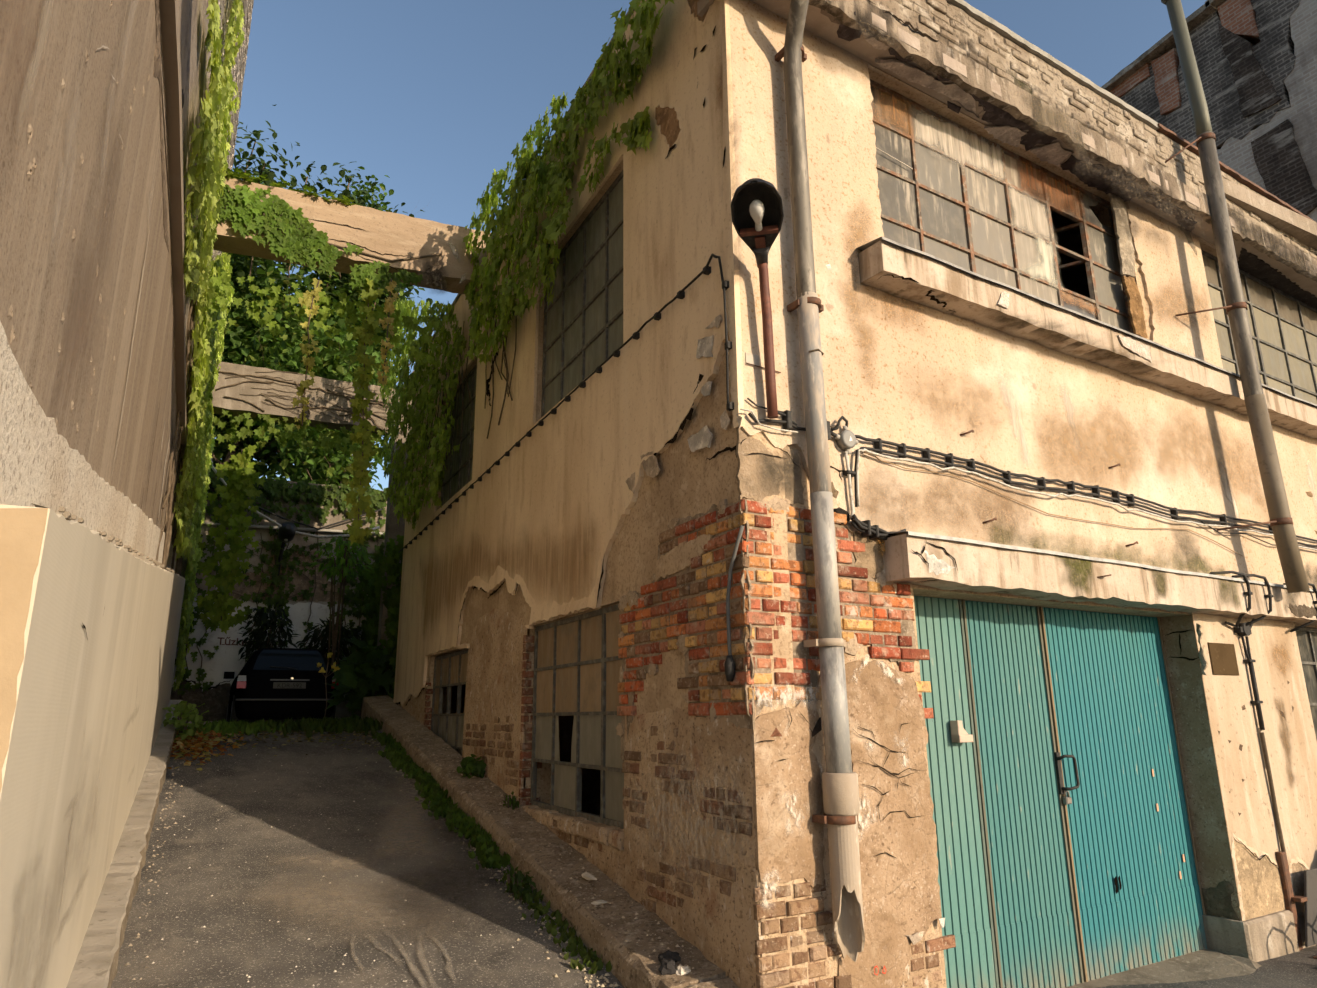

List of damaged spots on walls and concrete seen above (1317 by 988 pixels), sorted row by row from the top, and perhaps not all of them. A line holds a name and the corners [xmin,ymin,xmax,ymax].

peeling [837,11,1197,362]
crack [877,275,955,312]
damp [997,316,1147,369]
damp [1046,420,1134,473]
damp [1162,425,1258,517]
spalling [831,479,934,719]
crack [911,542,958,583]
damp [1180,537,1198,565]
spalling [462,315,852,988]
crack [751,660,942,988]
spalling [1202,833,1309,921]
rust [1275,851,1308,951]